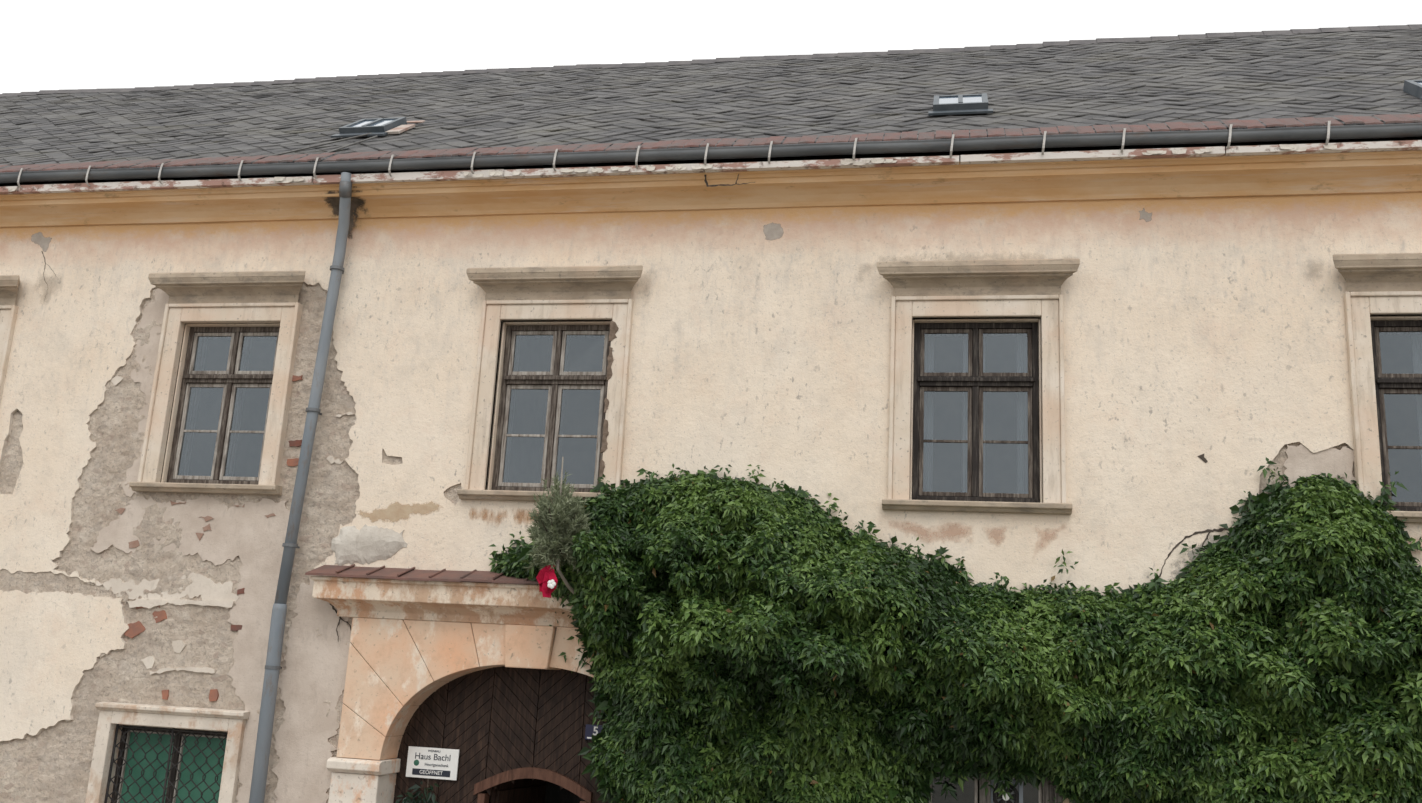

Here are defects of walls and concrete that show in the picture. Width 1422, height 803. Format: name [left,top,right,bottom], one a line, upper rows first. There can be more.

leakage [325,187,366,238]
spalling [1259,443,1356,494]
spalling [0,282,461,803]